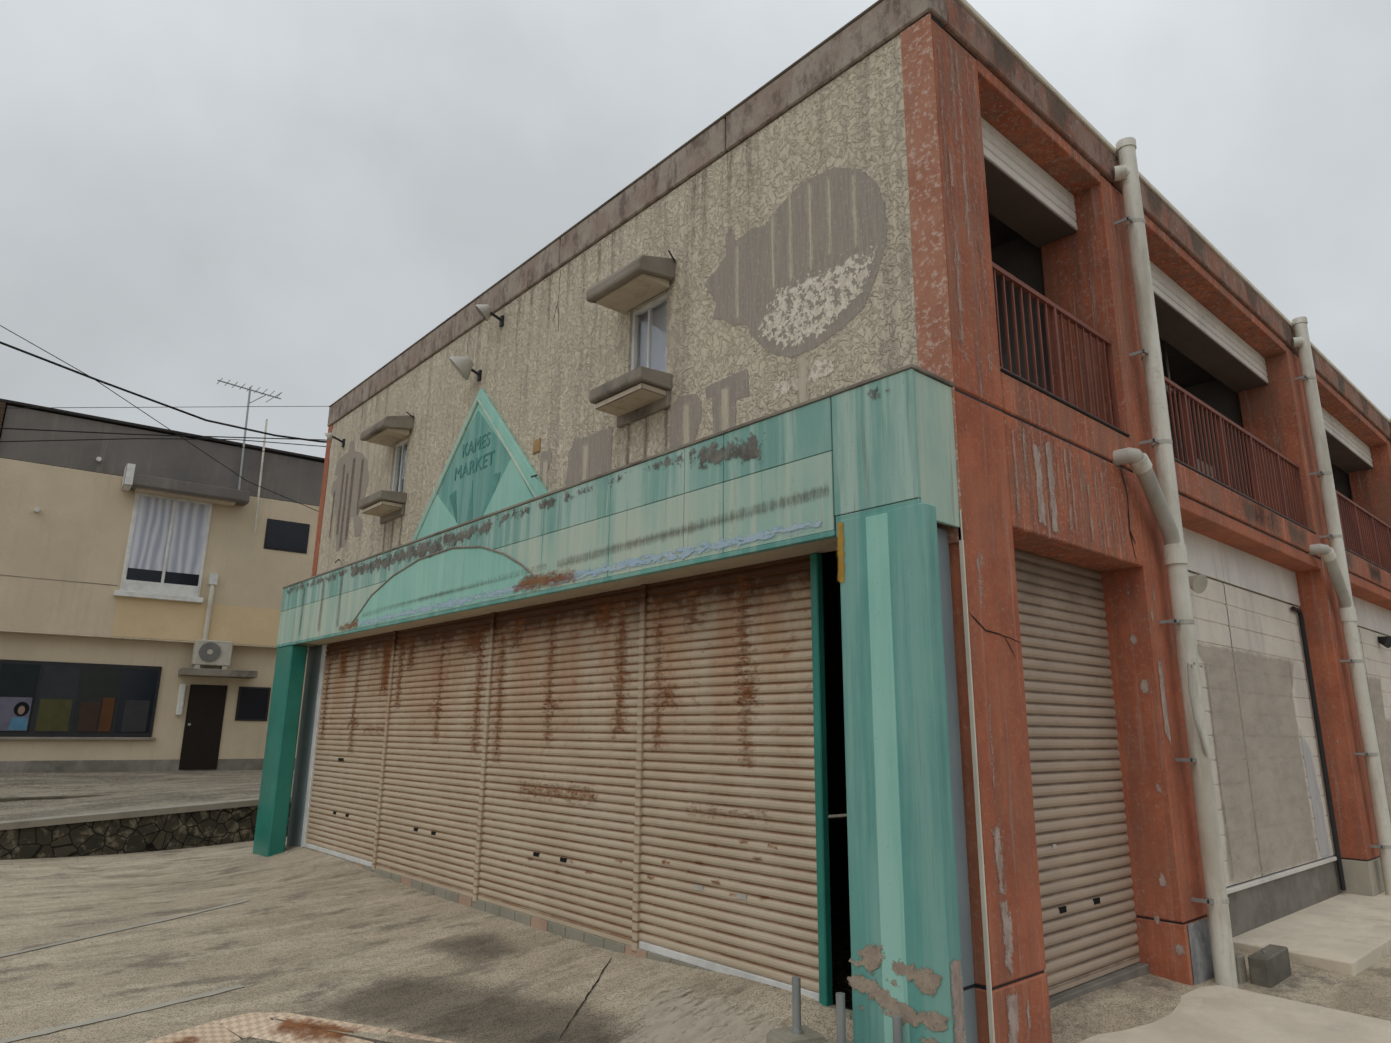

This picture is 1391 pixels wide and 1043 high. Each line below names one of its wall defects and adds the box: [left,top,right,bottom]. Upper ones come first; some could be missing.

peeling [705,167,887,403]
peeling [648,369,766,470]
peeling [287,427,626,594]
rust [514,569,573,592]
rust [321,648,378,751]
rust [379,639,416,705]
rust [464,616,523,763]
rust [595,600,628,734]
rust [734,578,757,764]
crack [971,615,1021,654]
peeling [847,944,966,1043]